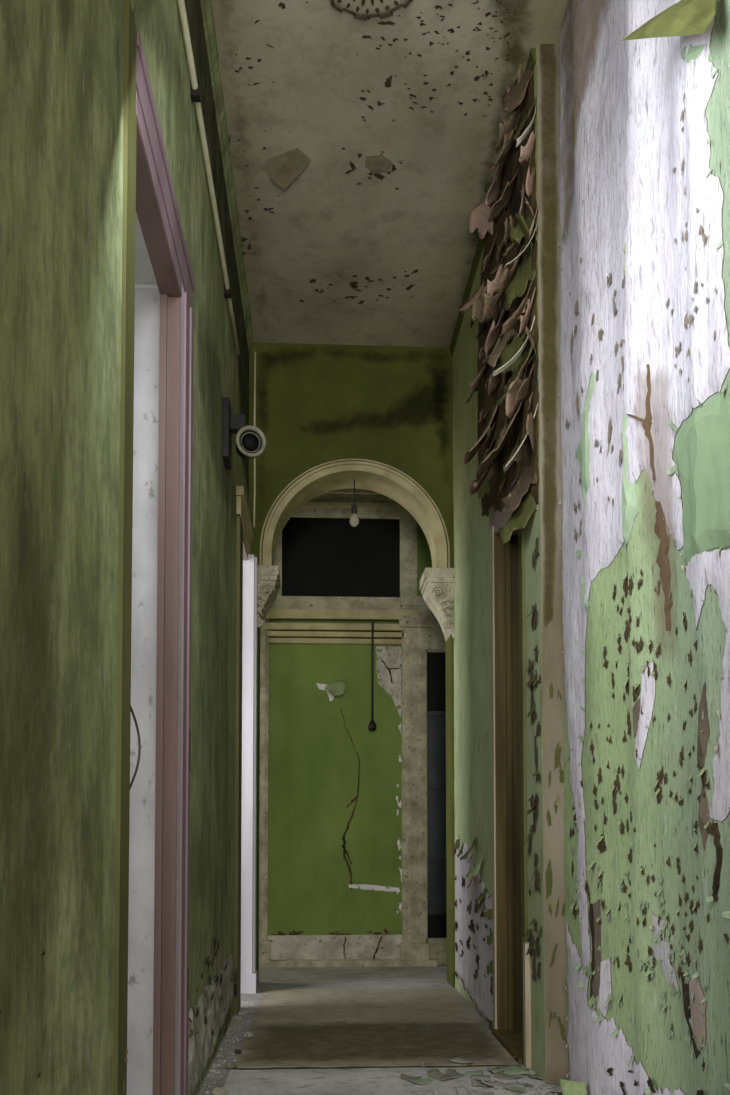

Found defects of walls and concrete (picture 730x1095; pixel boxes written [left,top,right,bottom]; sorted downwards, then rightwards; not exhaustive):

peeling [622,0,716,63]
peeling [238,147,310,220]
spalling [674,208,706,247]
peeling [362,0,539,544]
spalling [569,292,579,362]
spalling [607,273,625,316]
spalling [684,280,716,329]
spalling [614,339,624,394]
peeling [316,680,347,701]
peeling [375,646,402,733]
crack [341,709,360,891]
flaking render [188,938,237,1095]